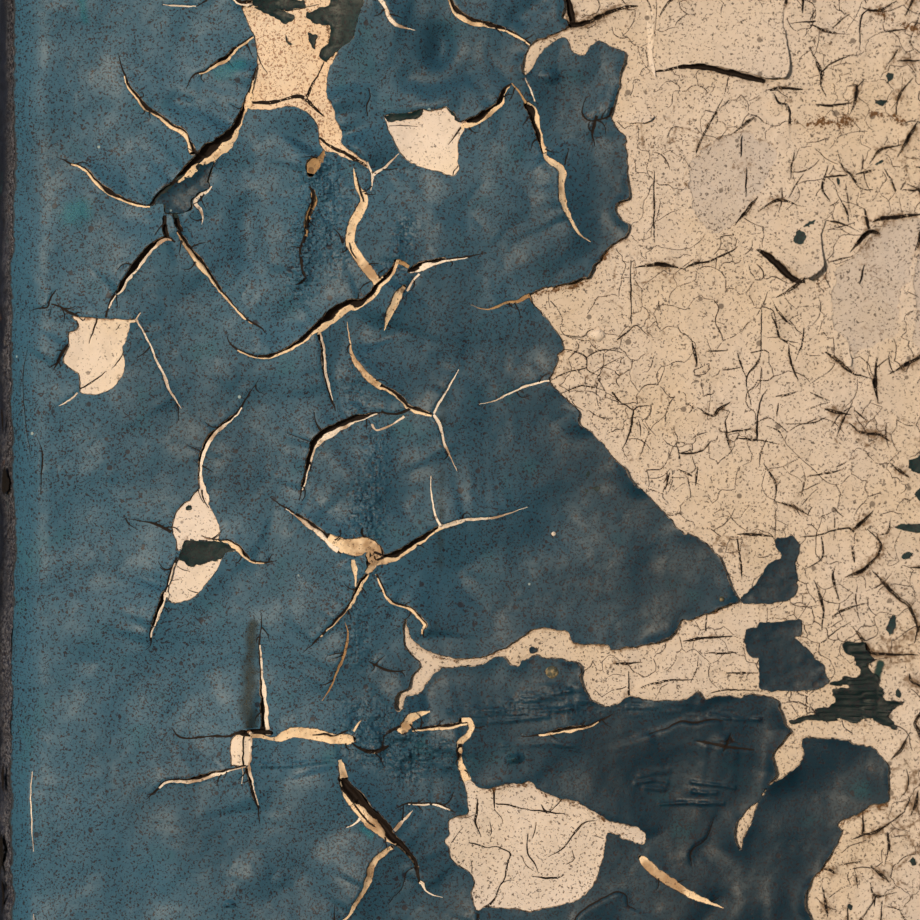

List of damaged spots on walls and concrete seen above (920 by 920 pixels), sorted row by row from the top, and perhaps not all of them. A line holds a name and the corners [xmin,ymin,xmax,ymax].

crack [374,0,413,30]
peeling [242,0,369,169]
crack [31,290,82,322]
crack [49,344,68,369]
peeling [64,316,135,394]
crack [58,35,527,701]
peeling [385,0,920,920]
crack [448,0,920,920]
peeling [164,479,236,602]
crack [28,772,36,852]
peeling [230,730,252,769]
crack [147,610,485,920]